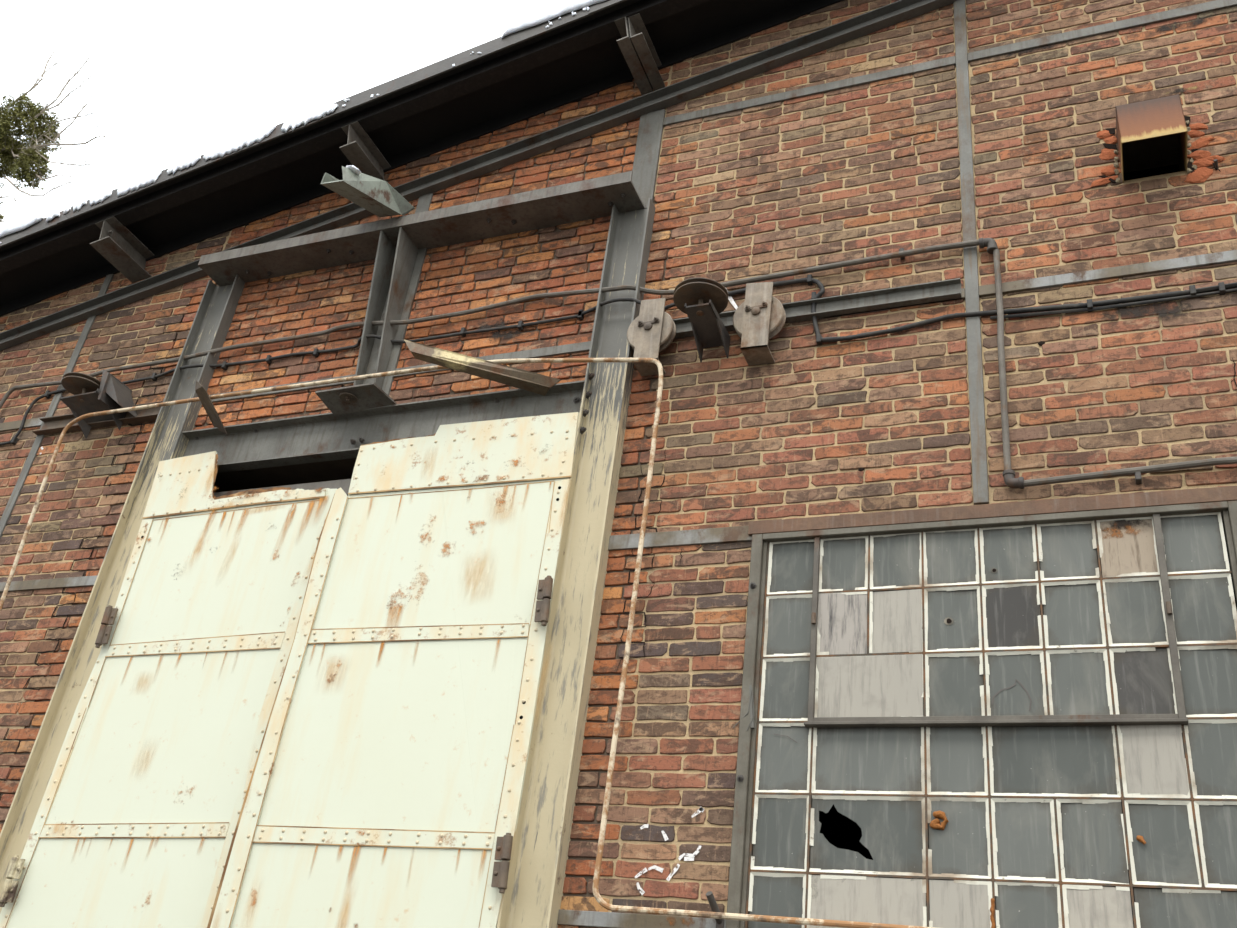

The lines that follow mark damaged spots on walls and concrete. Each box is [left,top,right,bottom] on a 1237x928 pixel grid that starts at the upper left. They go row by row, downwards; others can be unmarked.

peeling [1090,130,1118,187]
peeling [1184,123,1226,183]
corrosion [285,488,327,526]